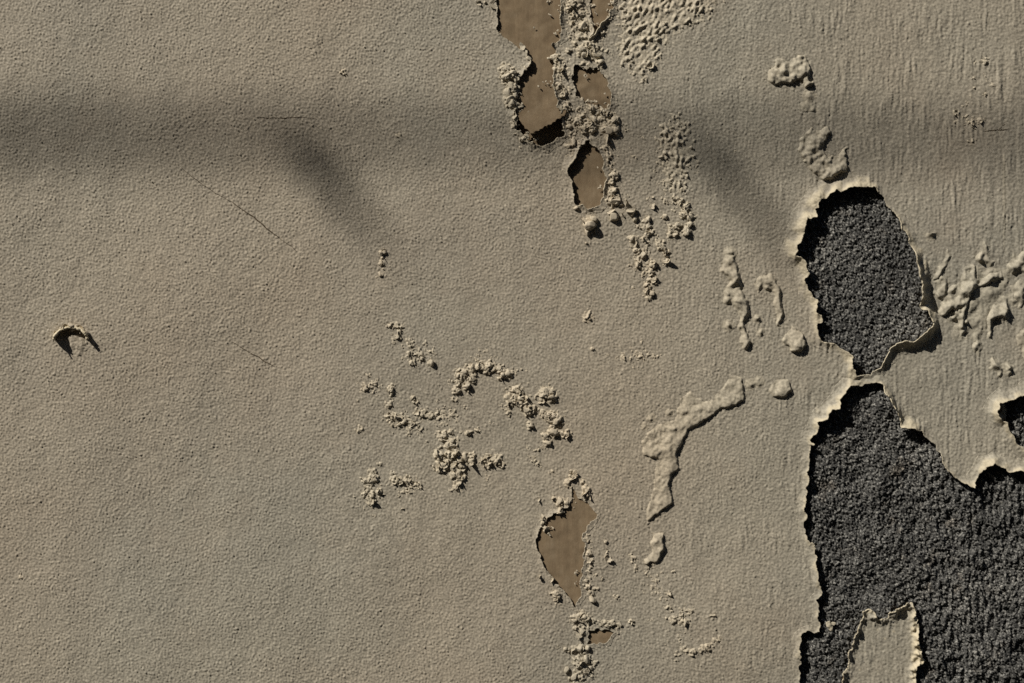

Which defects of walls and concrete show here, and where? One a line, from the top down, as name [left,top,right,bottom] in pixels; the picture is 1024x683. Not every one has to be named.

peeling [477,0,655,245]
spalling [796,187,1024,683]
peeling [532,469,632,683]